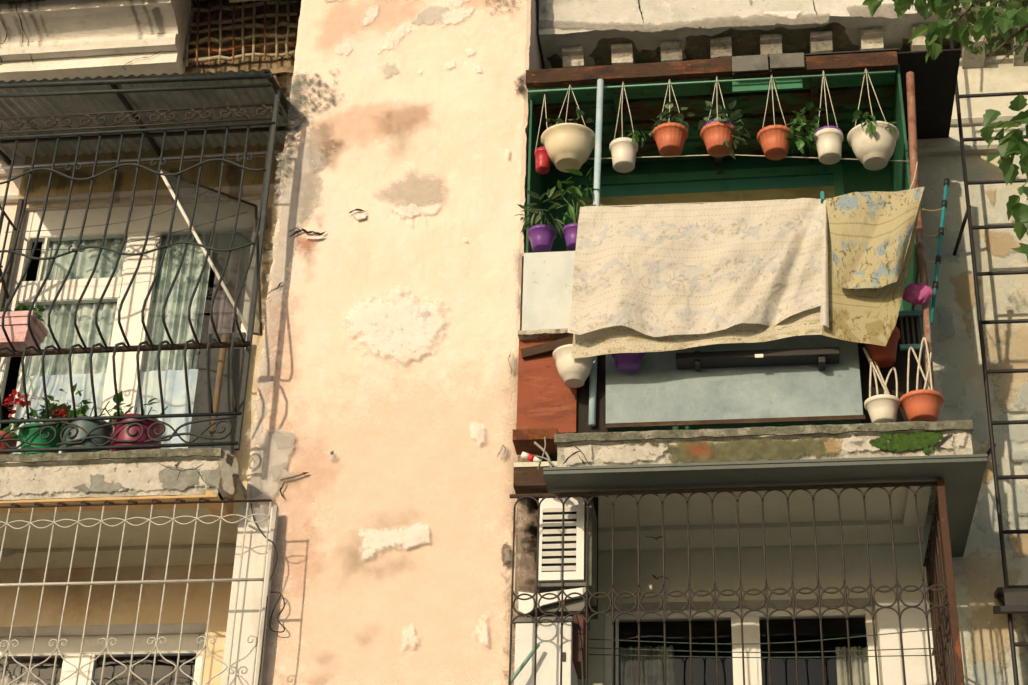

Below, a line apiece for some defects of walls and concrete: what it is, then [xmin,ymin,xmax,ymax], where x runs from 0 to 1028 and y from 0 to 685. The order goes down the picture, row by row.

damp [276,73,335,195]
spalling [391,204,440,226]
flaking render [0,127,332,503]
peeling [563,443,668,465]
peeling [843,435,889,452]
peeling [939,324,1028,685]